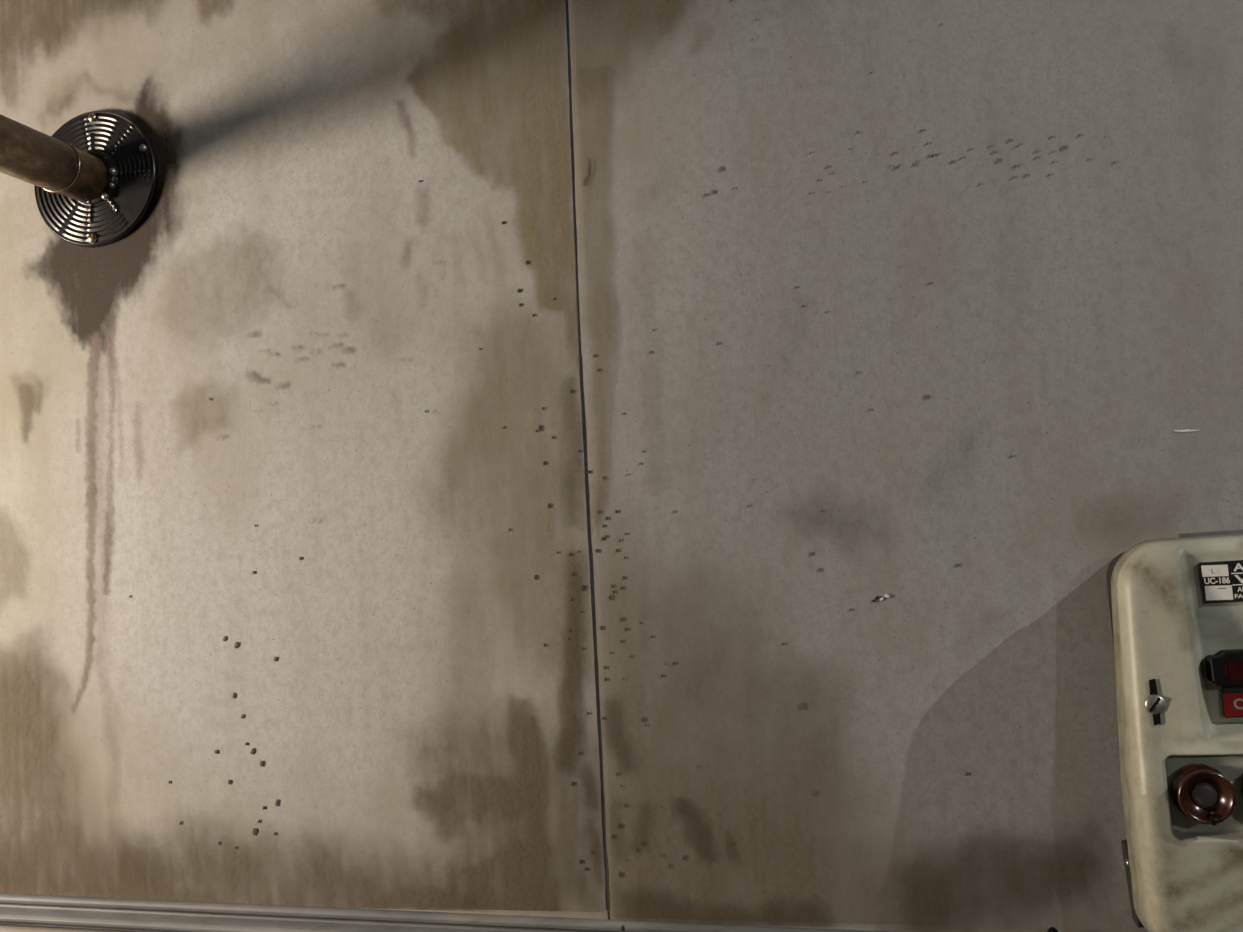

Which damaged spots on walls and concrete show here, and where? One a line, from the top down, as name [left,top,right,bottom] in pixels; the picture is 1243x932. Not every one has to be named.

damp [0,0,133,72]
damp [39,84,179,369]
damp [408,0,591,331]
damp [87,431,96,539]
damp [78,558,108,697]
damp [0,655,577,911]